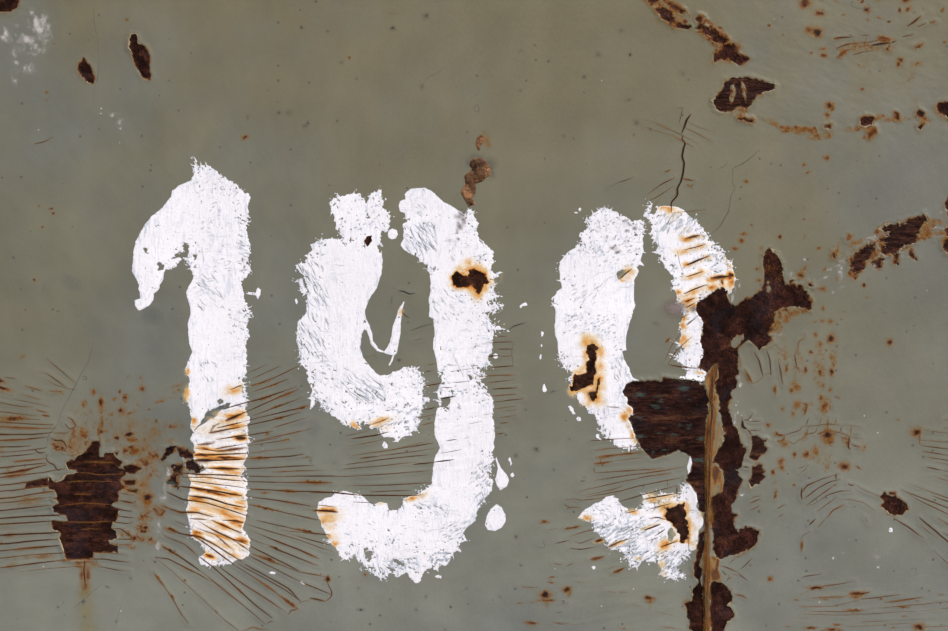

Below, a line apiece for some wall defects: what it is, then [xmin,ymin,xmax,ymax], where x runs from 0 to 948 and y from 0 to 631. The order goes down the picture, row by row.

rust [0,0,19,12]
rust [77,57,95,84]
rust [127,33,151,80]
rust [647,0,777,123]
rust [856,111,900,139]
rust [460,135,492,207]
rust [450,260,490,298]
rust [847,215,948,287]
rust [569,337,604,406]
rust [620,236,848,631]
rust [25,390,249,589]
rust [880,492,909,517]